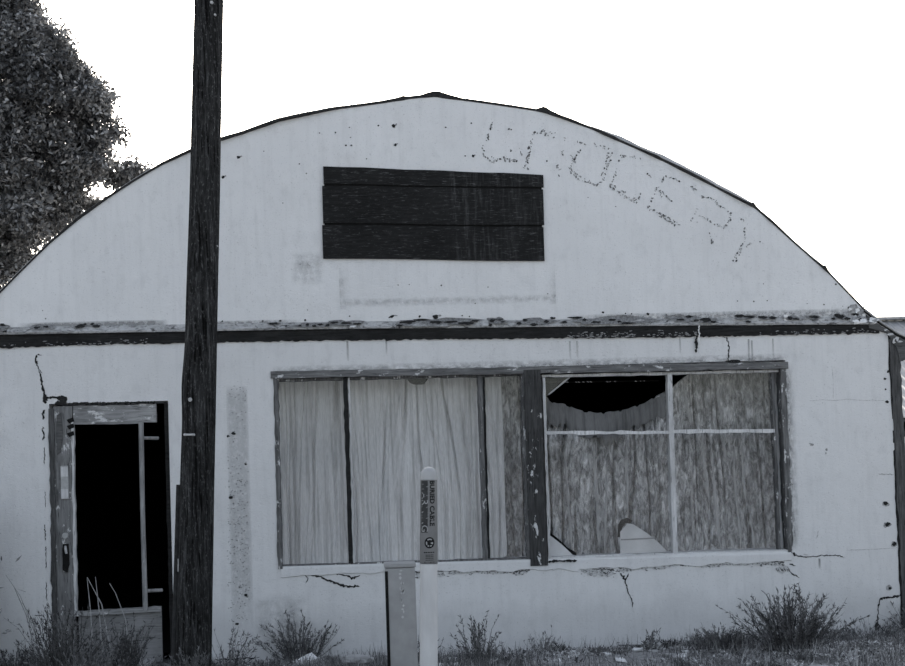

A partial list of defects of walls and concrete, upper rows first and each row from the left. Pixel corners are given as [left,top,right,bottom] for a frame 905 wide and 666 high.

flaking render [267,320,365,328]
flaking render [394,314,718,339]
flaking render [734,304,903,344]
crack [35,354,156,464]
crack [548,557,577,565]
crack [877,595,900,621]